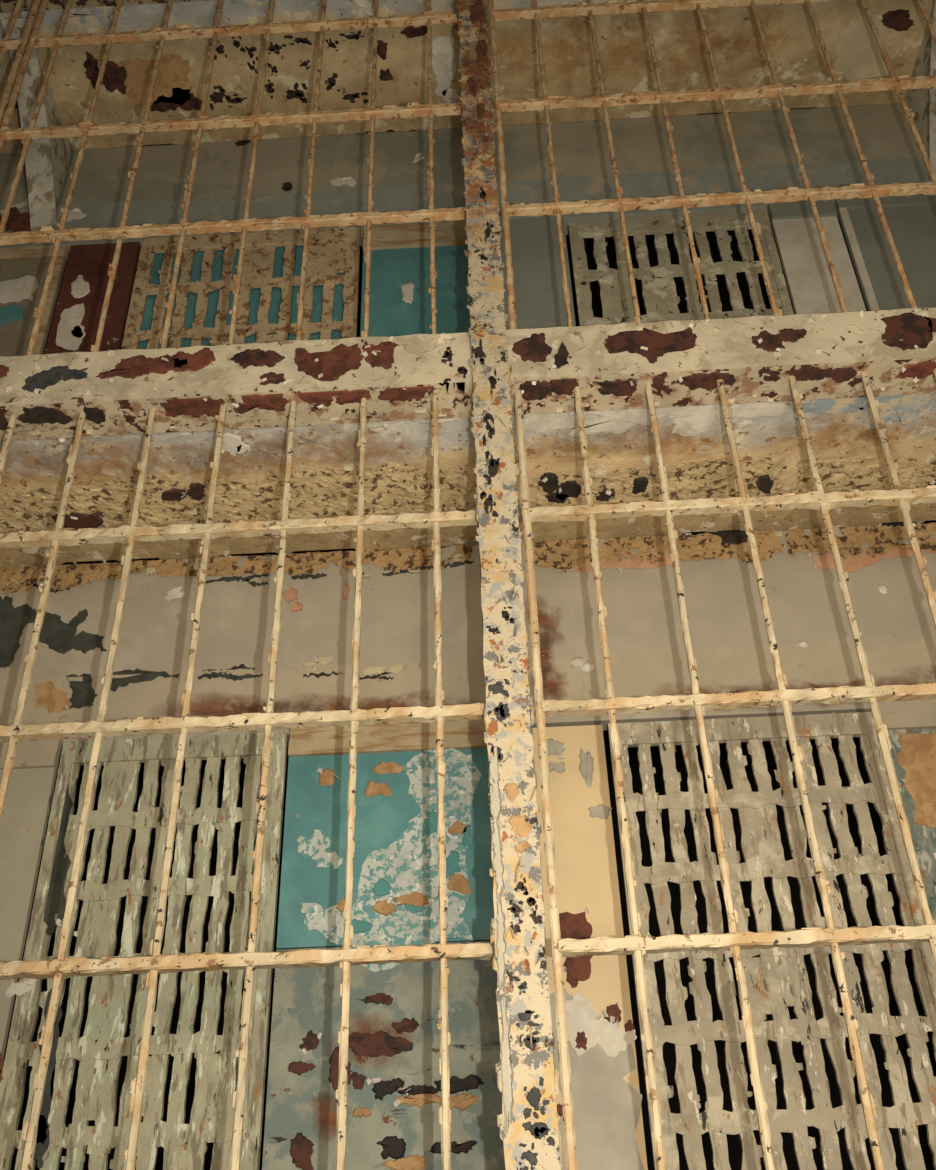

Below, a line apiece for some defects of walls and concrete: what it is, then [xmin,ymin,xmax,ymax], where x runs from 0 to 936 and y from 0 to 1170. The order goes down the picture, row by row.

peeling [83,51,247,113]
peeling [209,31,369,103]
peeling [56,275,90,351]
peeling [0,347,216,442]
peeling [145,337,500,456]
spalling [0,413,500,534]
spalling [0,544,474,668]
peeling [486,676,510,722]
peeling [41,767,73,935]
peeling [297,738,645,1170]
peeling [33,989,63,1169]
peeling [290,1132,314,1170]